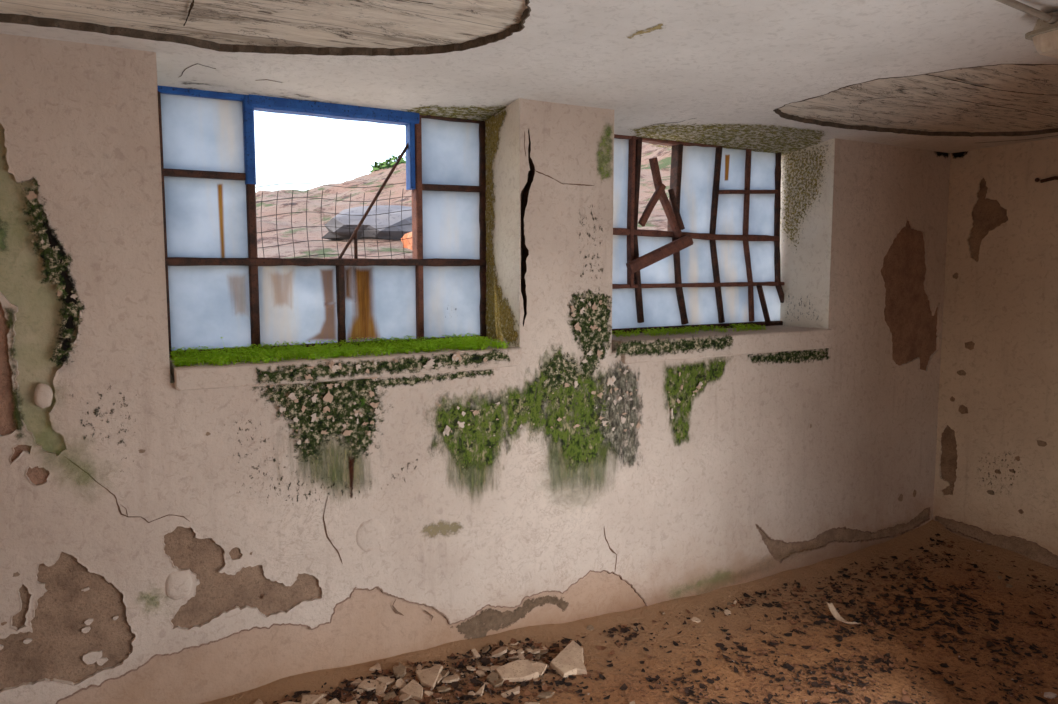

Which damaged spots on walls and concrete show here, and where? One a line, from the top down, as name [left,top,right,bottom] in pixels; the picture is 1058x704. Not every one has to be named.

crack [183,0,194,26]
crack [521,130,594,326]
flaking render [0,118,82,488]
flaking render [880,216,940,372]
crack [64,456,189,523]
damp [233,420,372,507]
damp [594,362,643,468]
flaking render [755,507,1058,570]
flaking render [0,524,648,704]